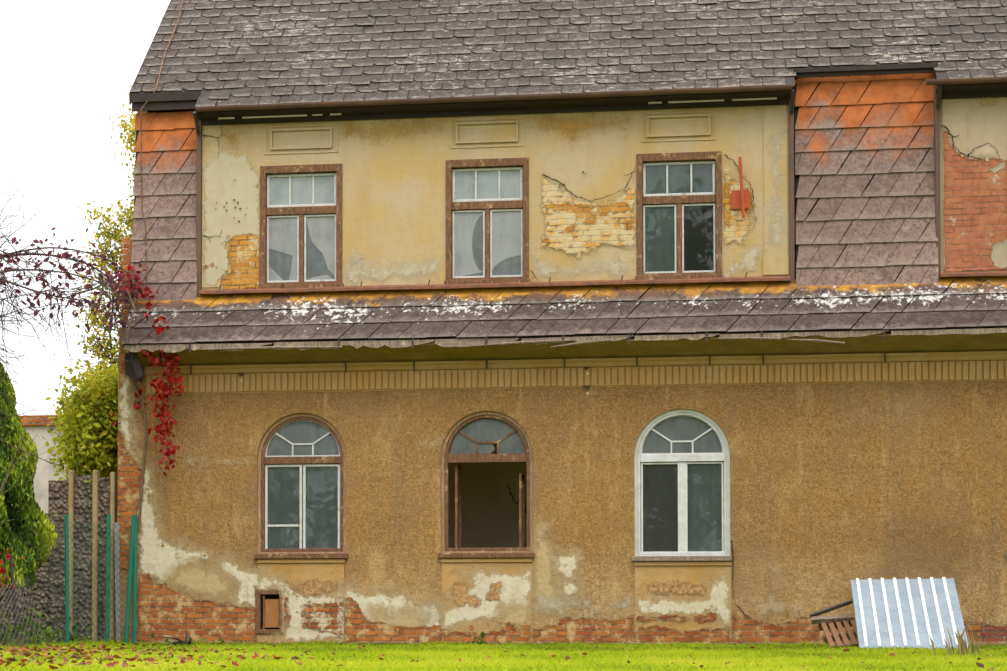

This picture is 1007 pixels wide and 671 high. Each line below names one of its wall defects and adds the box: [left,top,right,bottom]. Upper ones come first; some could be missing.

peeling [202,150,259,289]
flaking render [540,172,636,258]
flaking render [722,168,758,244]
flaking render [943,131,1007,272]
flaking render [117,352,858,643]
flaking render [963,619,1007,641]